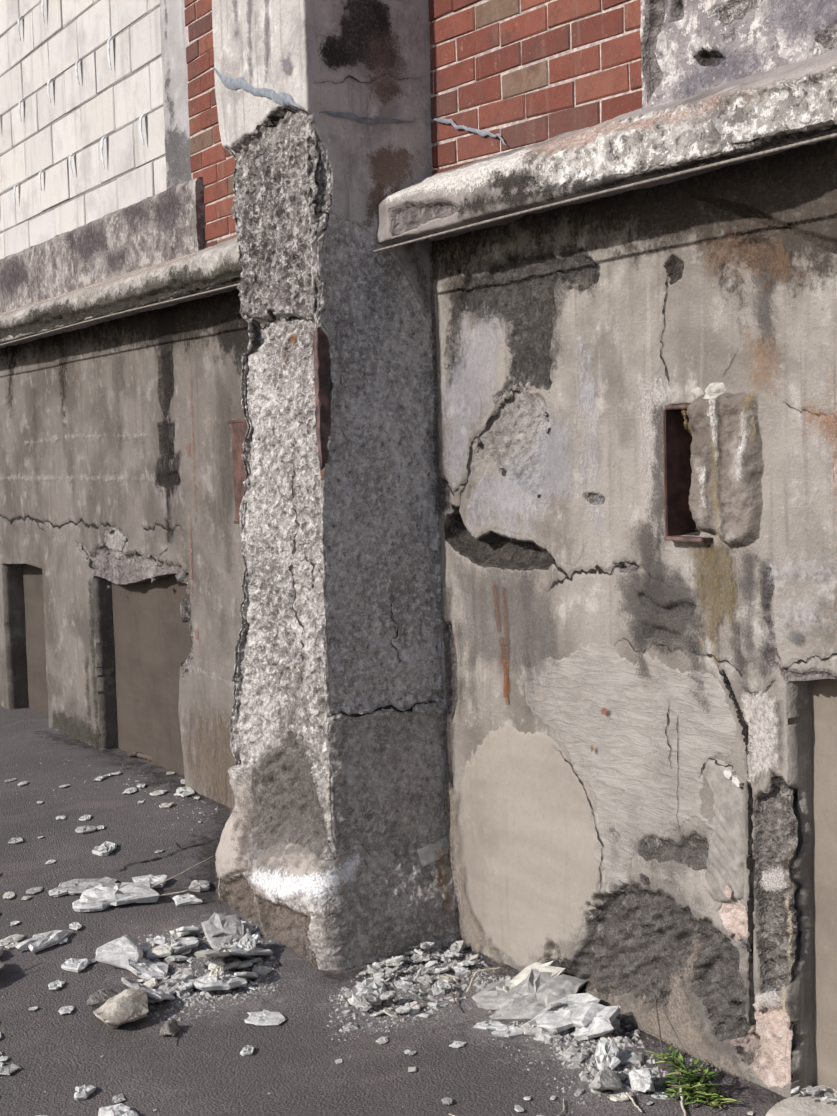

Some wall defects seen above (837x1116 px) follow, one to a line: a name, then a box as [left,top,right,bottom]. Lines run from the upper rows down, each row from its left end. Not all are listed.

damp [232,0,293,83]
crack [213,68,506,145]
damp [0,265,248,542]
spalling [460,244,601,498]
damp [387,138,837,525]
crack [660,263,676,387]
crack [0,515,182,569]
peeling [0,105,554,970]
corrosion [492,584,509,704]
spalling [545,772,799,1088]
crack [615,638,837,1025]
spalling [574,1039,644,1102]